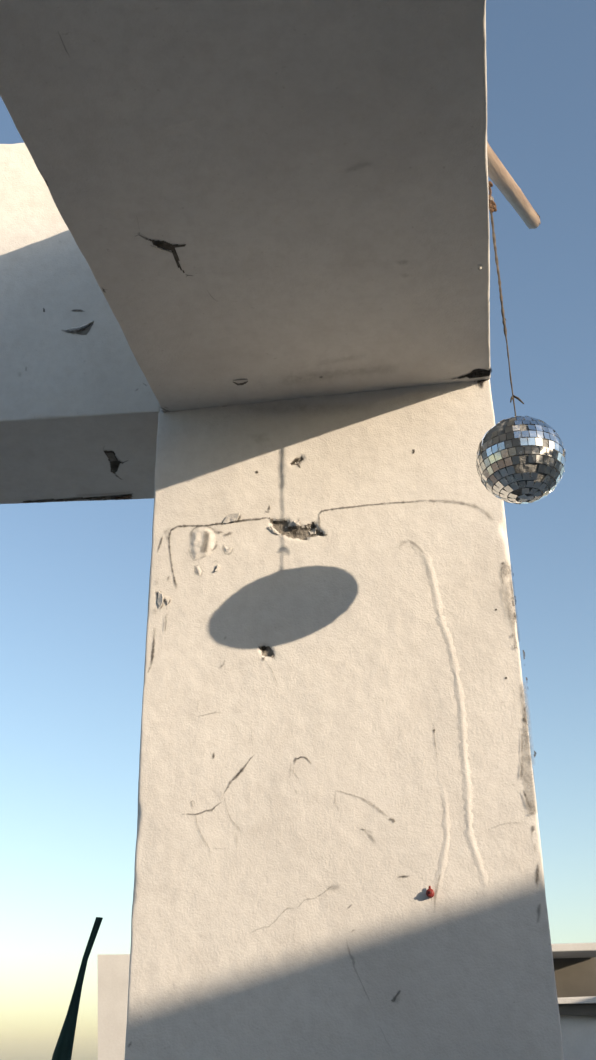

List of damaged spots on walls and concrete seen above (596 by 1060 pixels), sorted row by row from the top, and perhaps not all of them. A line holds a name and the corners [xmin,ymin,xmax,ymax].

crack [139,235,192,276]
peeling [66,320,94,335]
spalling [104,451,126,477]
spalling [266,506,327,540]
crack [159,518,263,584]
spalling [259,646,274,660]